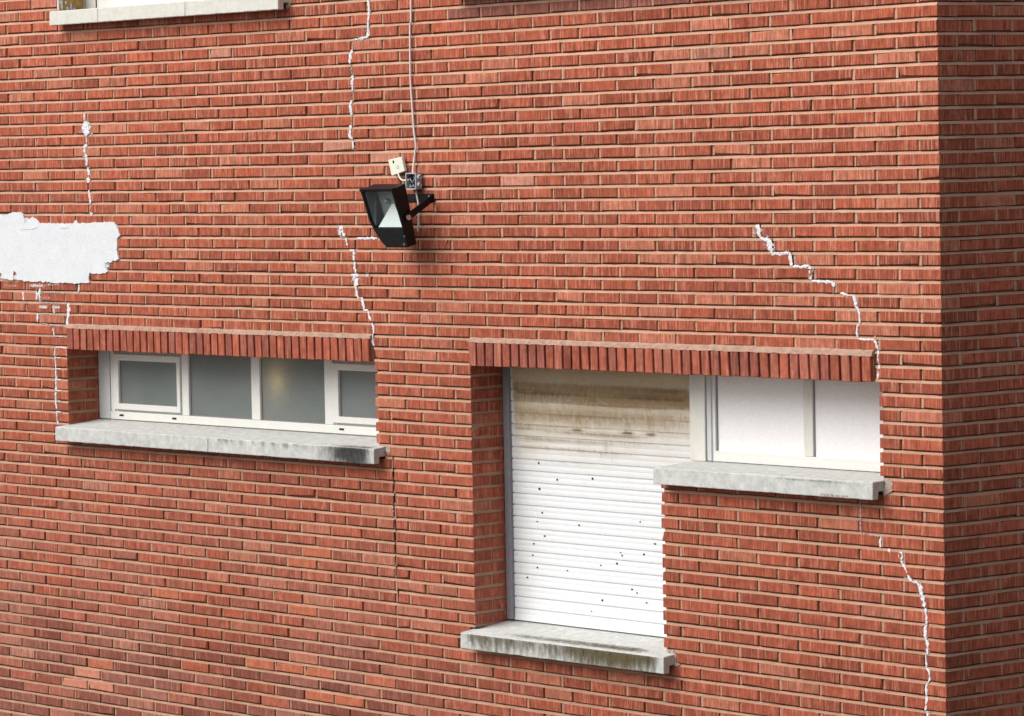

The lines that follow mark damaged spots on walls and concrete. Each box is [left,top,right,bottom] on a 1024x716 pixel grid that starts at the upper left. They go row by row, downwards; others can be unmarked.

crack [347,0,371,149]
crack [80,113,93,216]
crack [22,285,81,425]
crack [338,225,374,346]
damp [513,367,690,437]
crack [753,224,881,379]
crack [860,502,931,716]